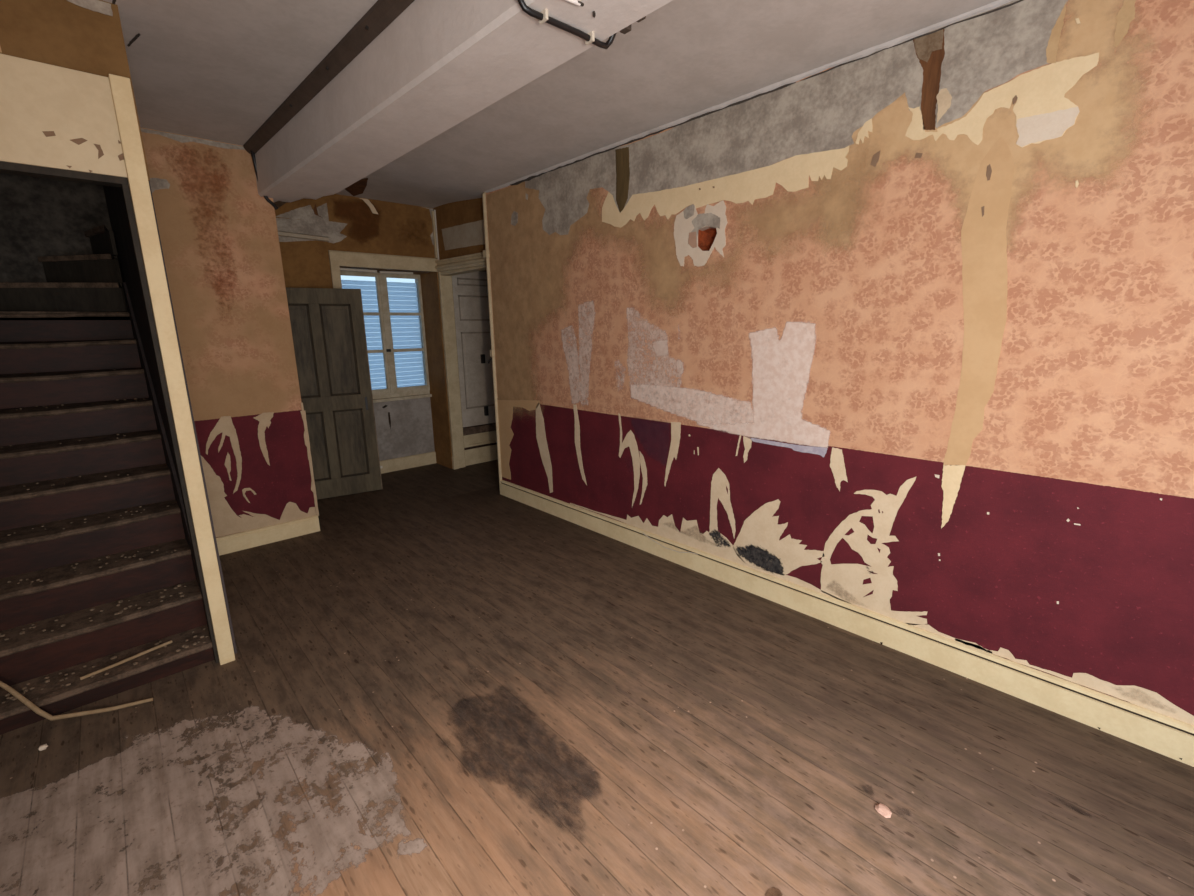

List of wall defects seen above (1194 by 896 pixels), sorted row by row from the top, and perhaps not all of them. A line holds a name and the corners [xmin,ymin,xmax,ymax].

flaking render [925,0,1080,128]
peeling [70,138,104,173]
flaking render [276,203,347,243]
spalling [345,178,368,196]
spalling [674,201,728,267]
flaking render [525,40,923,235]
peeling [1016,107,1080,147]
peeling [201,411,319,537]
peeling [497,400,553,493]
peeling [570,405,1194,726]